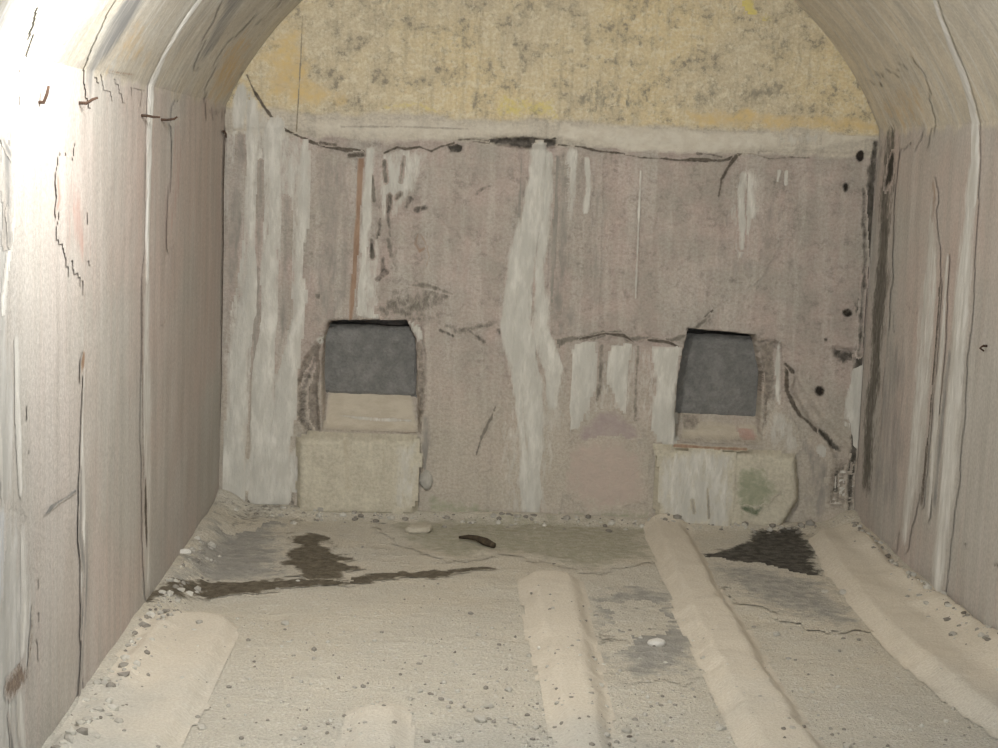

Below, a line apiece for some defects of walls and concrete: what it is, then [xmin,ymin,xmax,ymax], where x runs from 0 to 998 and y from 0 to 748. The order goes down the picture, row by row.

damp [84,0,981,634]
crack [782,362,842,453]